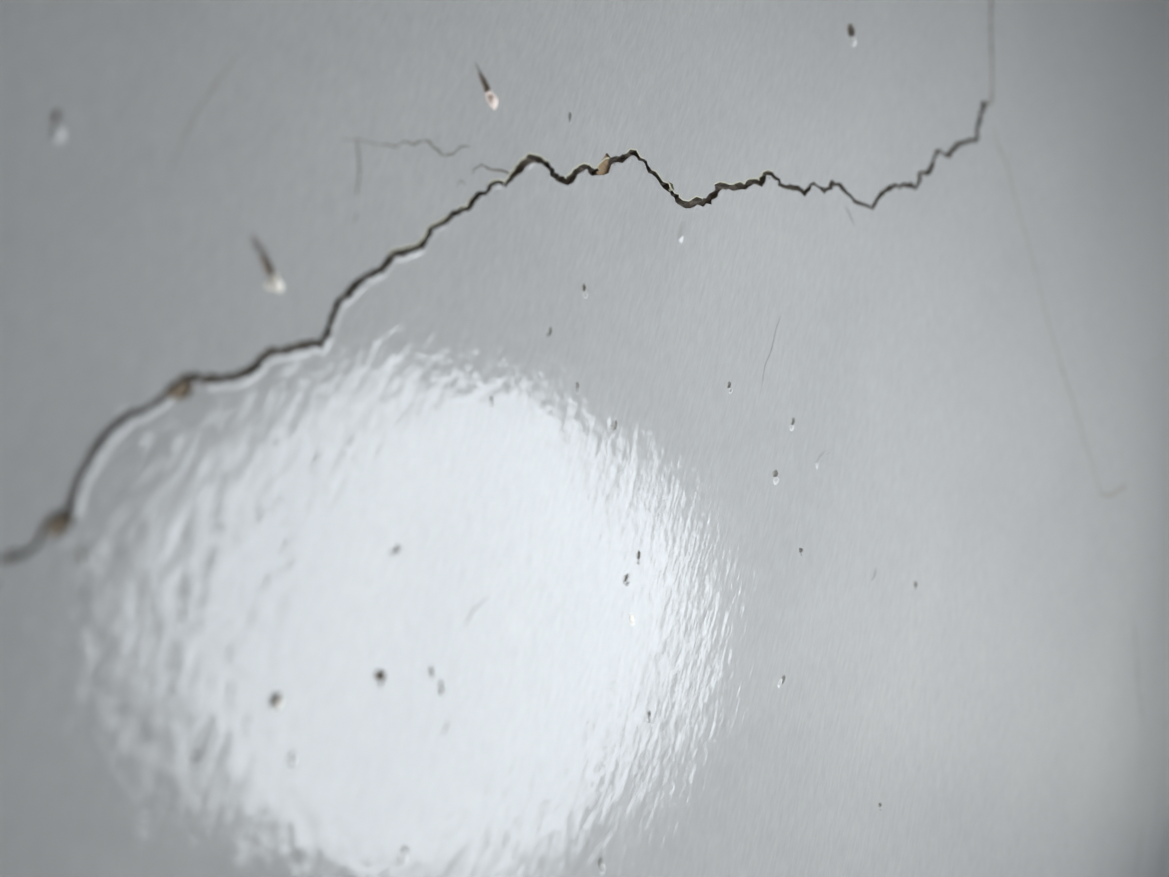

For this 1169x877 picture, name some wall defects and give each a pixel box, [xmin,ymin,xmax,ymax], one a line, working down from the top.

crack [0,0,993,562]